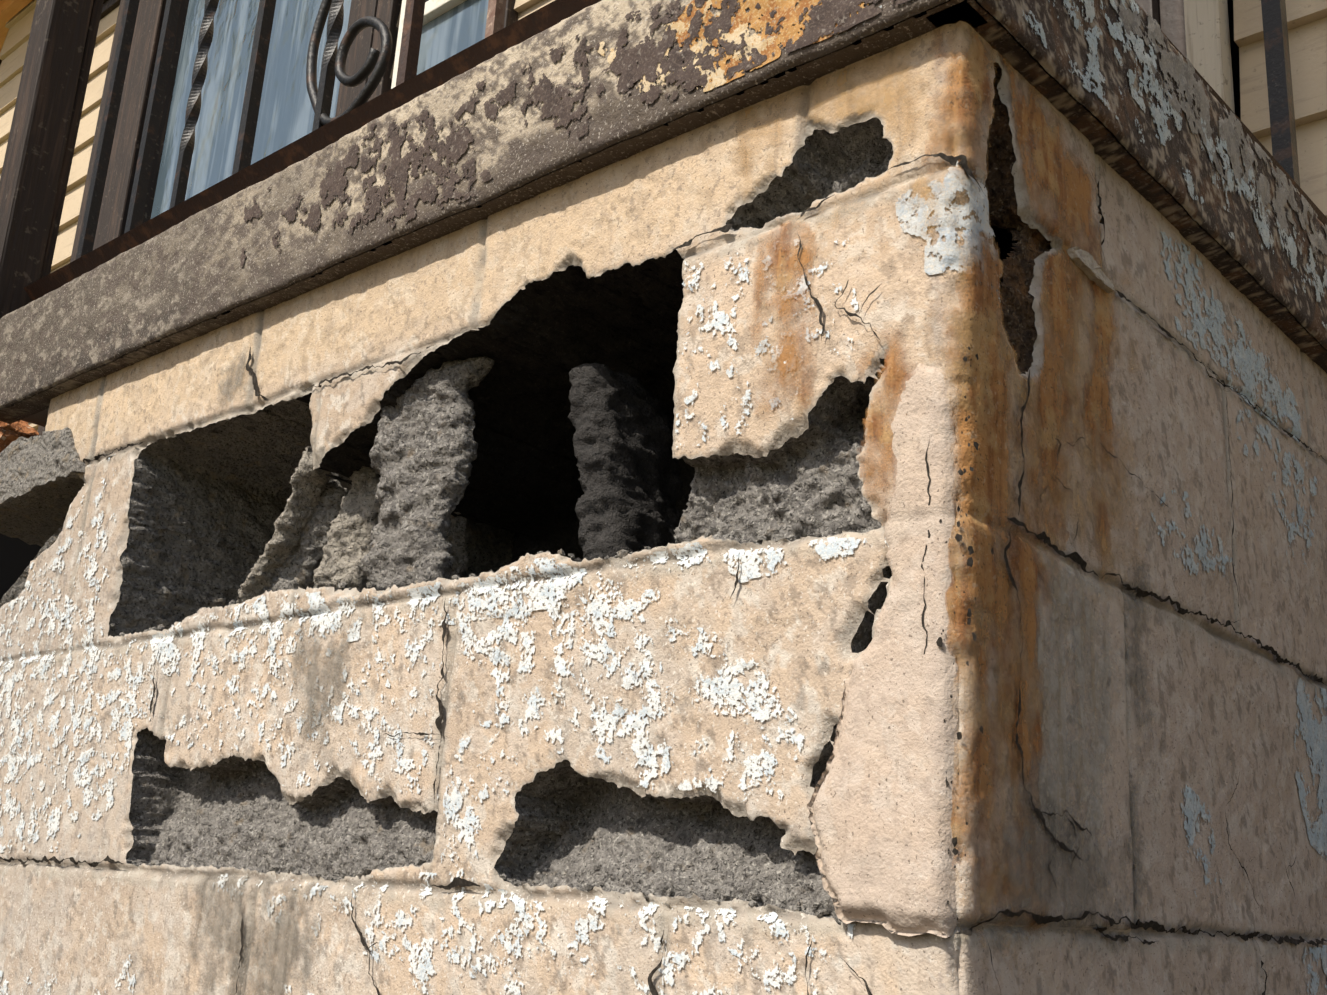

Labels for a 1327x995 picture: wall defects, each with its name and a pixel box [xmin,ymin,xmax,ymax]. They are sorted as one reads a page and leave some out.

rust [673,0,869,85]
peeling [1022,10,1050,49]
peeling [243,184,272,222]
peeling [271,0,909,255]
rust [942,33,1100,254]
rust [1085,281,1116,450]
leakage [293,639,348,737]
spalling [0,249,889,995]
rust [948,239,1043,867]
crack [955,168,1327,995]
leakage [190,872,315,995]